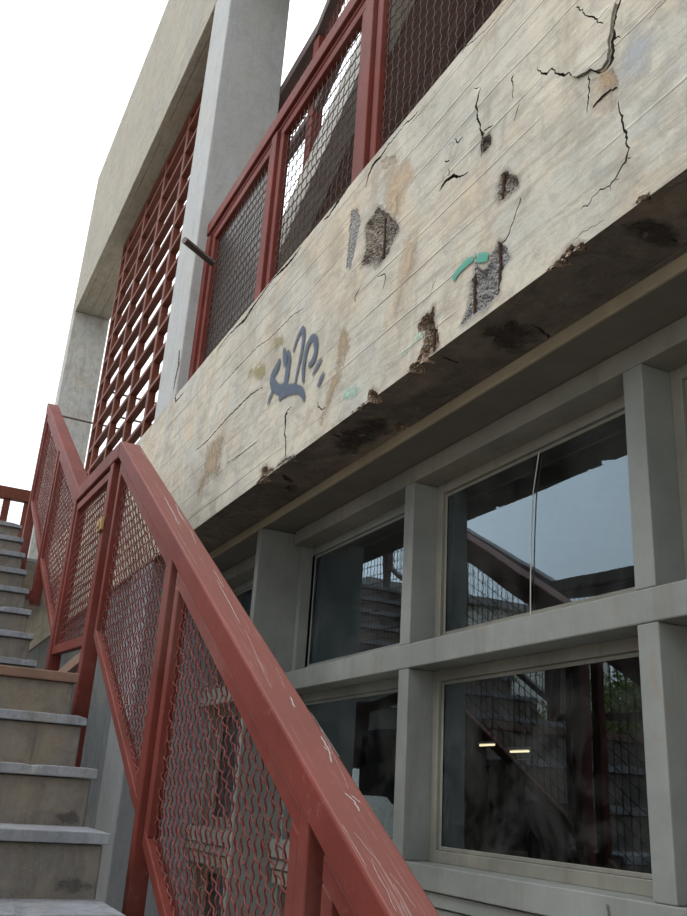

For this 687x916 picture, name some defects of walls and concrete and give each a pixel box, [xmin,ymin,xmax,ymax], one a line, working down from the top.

crack [439,87,493,191]
crack [537,0,631,239]
spalling [497,171,519,202]
crack [217,247,301,350]
spalling [346,206,399,270]
spalling [461,241,510,325]
spalling [546,242,590,272]
damp [626,219,677,247]
spalling [409,306,440,373]
crack [196,387,262,450]
spalling [256,455,297,484]
crack [282,407,294,483]